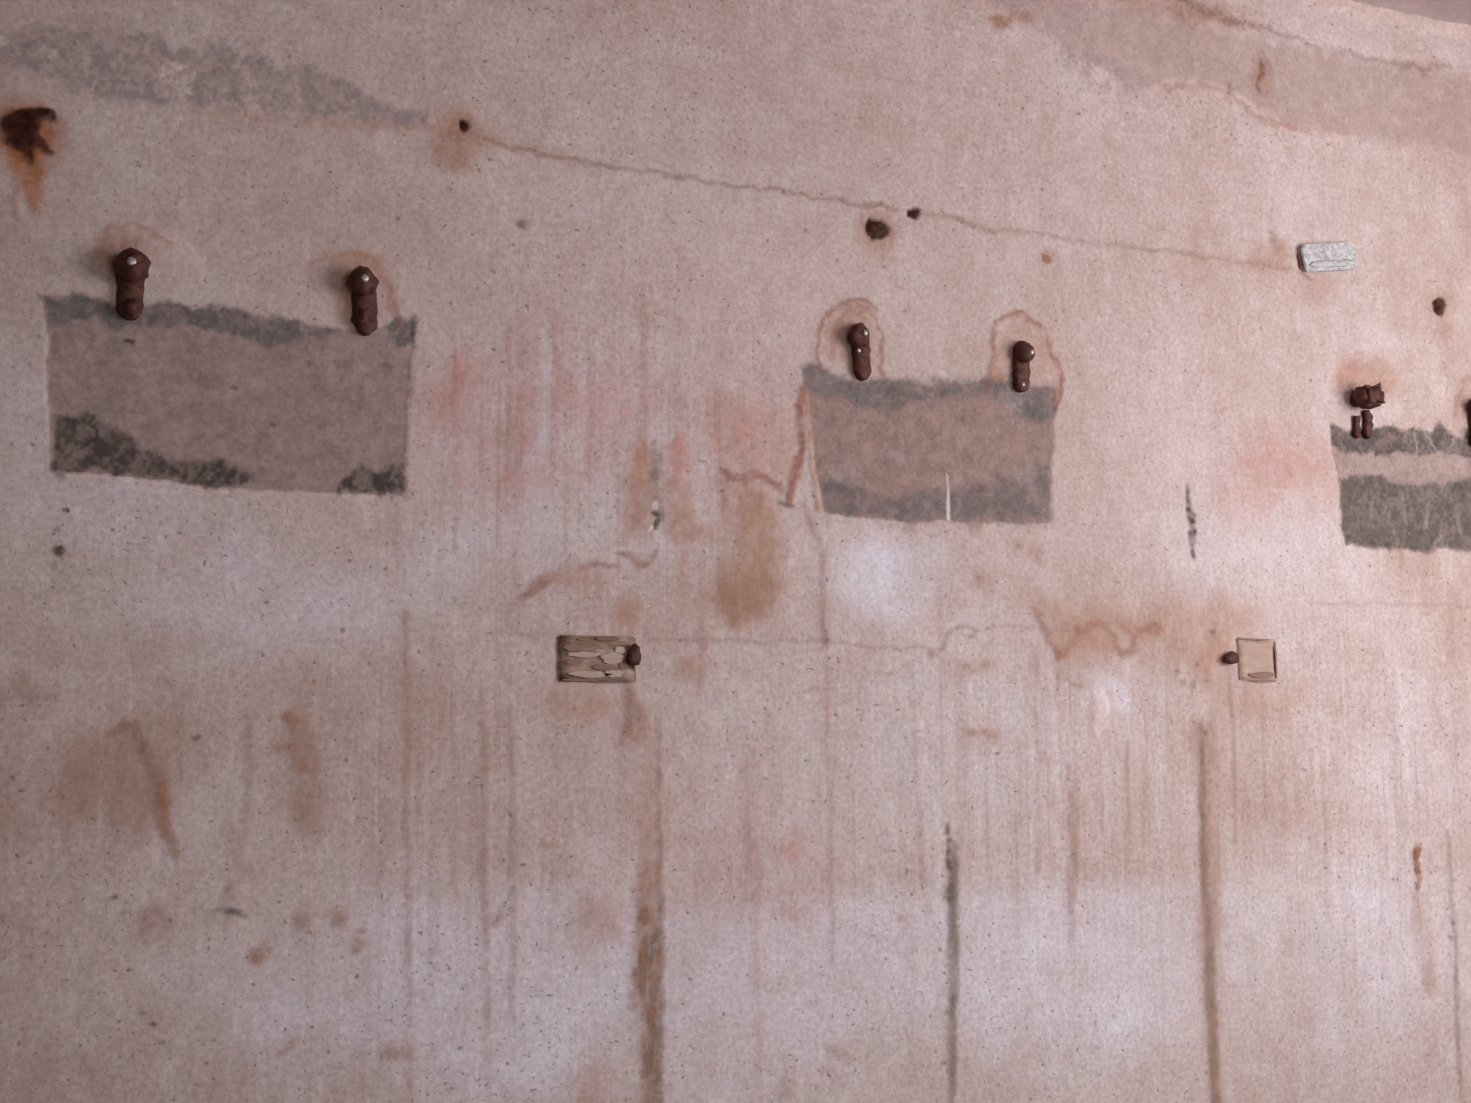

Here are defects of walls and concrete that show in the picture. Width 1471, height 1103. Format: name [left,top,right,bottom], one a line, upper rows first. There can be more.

rust [2,107,57,185]
water stain [947,825,959,963]
water stain [1202,790,1211,923]
water stain [635,901,665,1103]